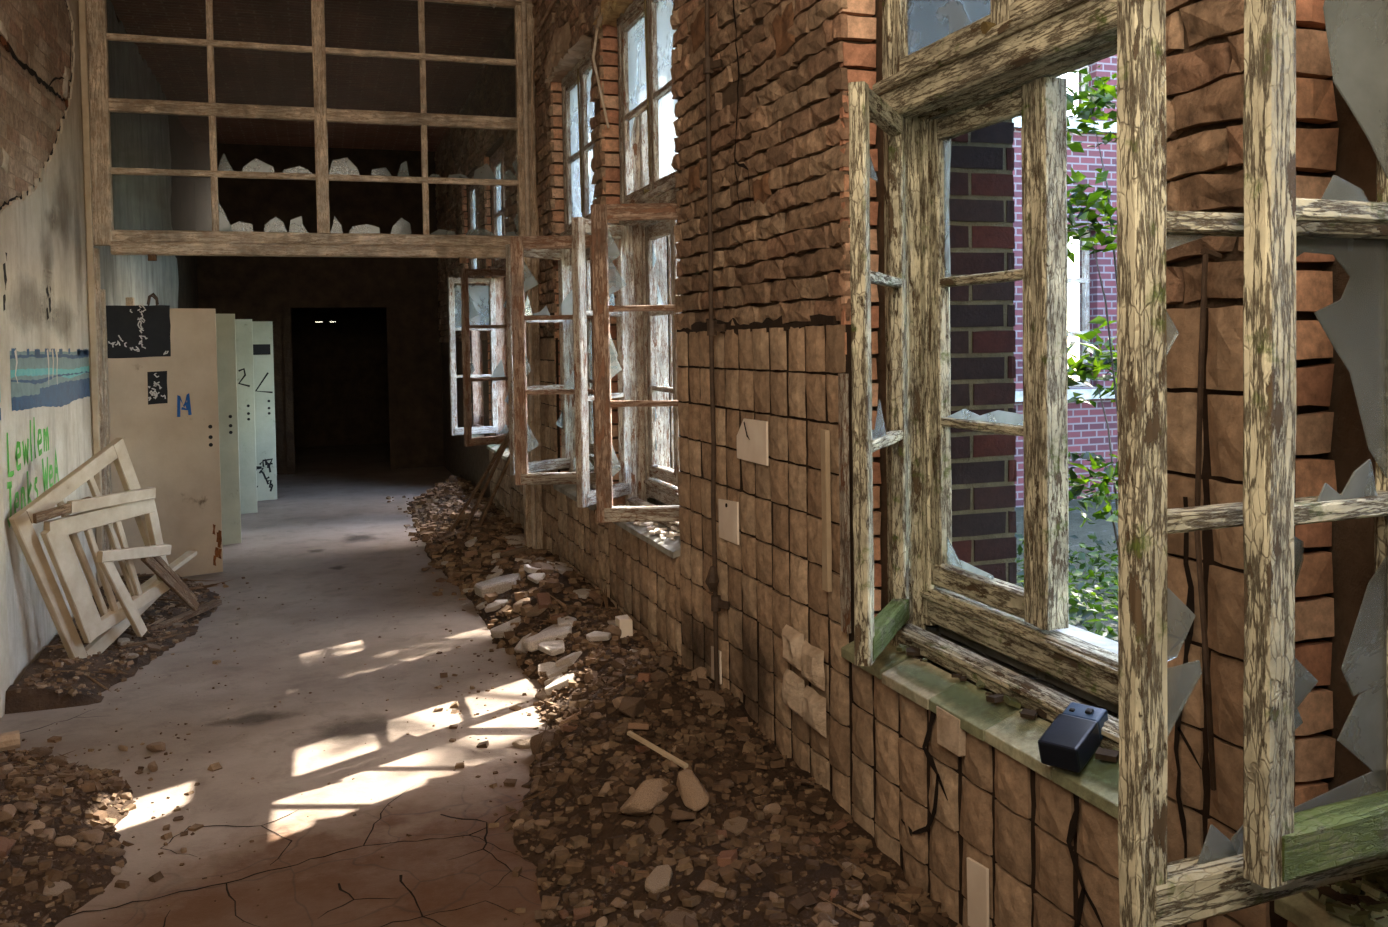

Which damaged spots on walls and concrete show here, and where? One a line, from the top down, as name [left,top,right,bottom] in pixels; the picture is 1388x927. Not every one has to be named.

flaking render [0,0,75,210]
flaking render [677,314,839,335]
crack [901,711,948,836]
crack [64,786,535,927]
crack [1066,795,1103,927]